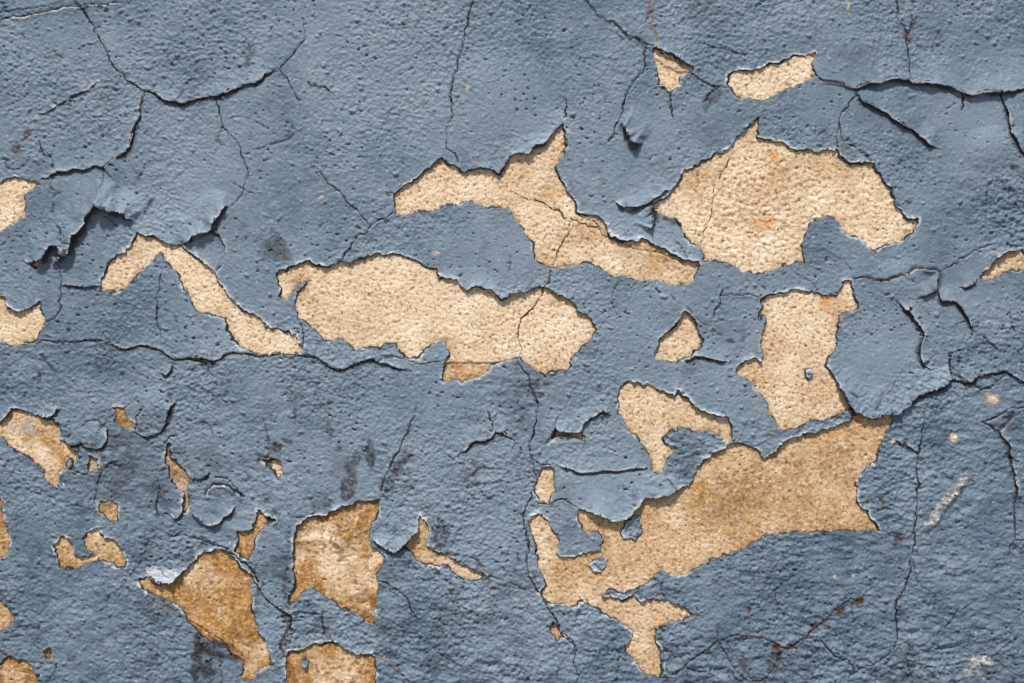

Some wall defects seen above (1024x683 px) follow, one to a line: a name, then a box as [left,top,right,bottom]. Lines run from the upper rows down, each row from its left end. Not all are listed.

crack [0,0,329,206]
peeling [727,52,816,101]
crack [818,0,1024,159]
peeling [92,189,304,358]
crack [24,260,442,372]
peeling [277,253,596,384]
peeling [394,105,918,290]
crack [457,192,692,683]
peeling [523,281,952,677]
crack [662,244,1024,683]
crack [155,478,326,677]
peeling [140,499,483,683]